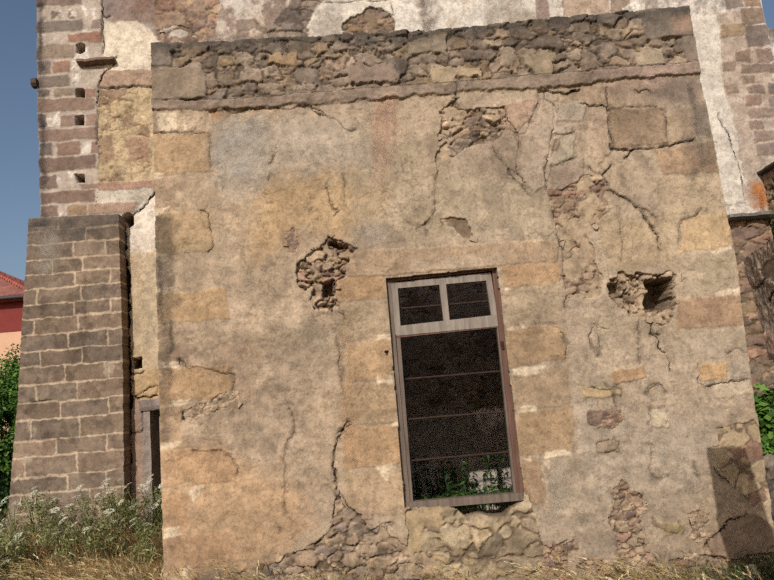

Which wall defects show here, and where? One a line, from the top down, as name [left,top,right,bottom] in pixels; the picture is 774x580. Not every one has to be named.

flaking render [342,4,396,35]
crack [96,0,152,137]
flaking render [435,96,507,163]
crack [493,89,693,253]
spalling [283,229,357,312]
flaking render [440,218,478,242]
flaking render [546,174,686,326]
crack [637,323,671,394]
crack [332,422,352,508]
flaking render [712,420,770,507]
flaking render [231,479,774,580]
crack [704,496,747,550]